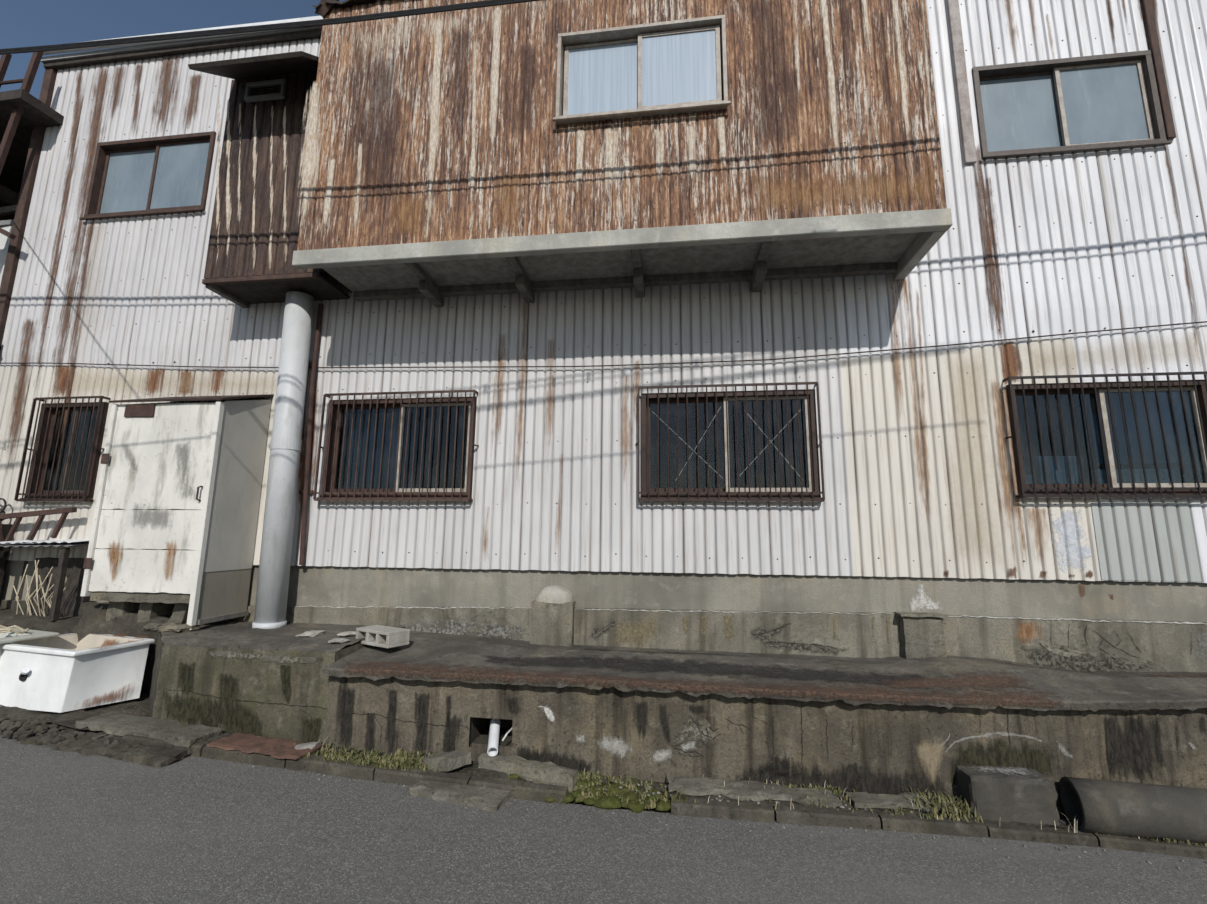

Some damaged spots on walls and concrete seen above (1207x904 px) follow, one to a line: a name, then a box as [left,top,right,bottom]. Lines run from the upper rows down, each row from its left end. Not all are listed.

rust [8,56,201,465]
rust [975,148,1045,552]
rust [892,275,929,508]
rust [109,543,122,579]
rust [165,543,175,578]
crack [1050,624,1150,662]
leakage [163,662,262,736]
leakage [339,689,398,753]
leakage [414,693,429,754]
leakage [442,696,461,752]
leakage [517,747,590,773]
leakage [737,732,1071,799]